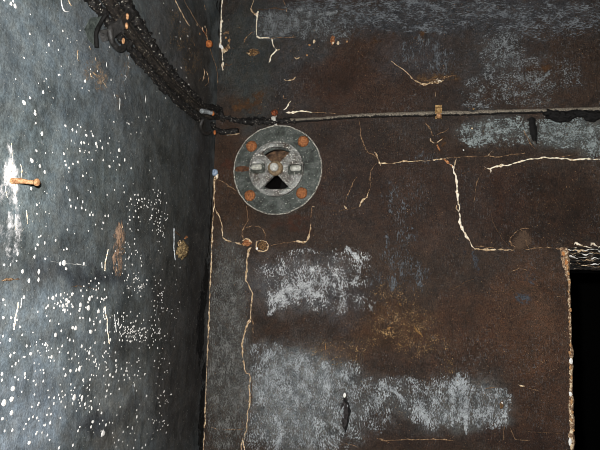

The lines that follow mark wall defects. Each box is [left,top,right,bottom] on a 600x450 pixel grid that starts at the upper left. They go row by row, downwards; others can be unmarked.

crack [219,0,294,70]
crack [391,61,455,96]
peeling [249,0,600,161]
damp [523,117,538,147]
rust [310,284,456,373]
crack [203,122,600,450]
spalling [560,242,600,450]